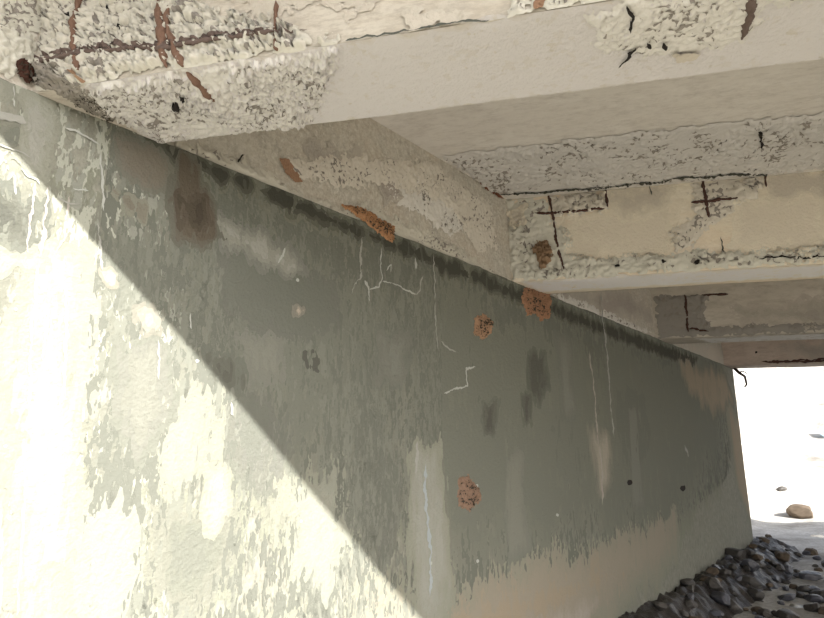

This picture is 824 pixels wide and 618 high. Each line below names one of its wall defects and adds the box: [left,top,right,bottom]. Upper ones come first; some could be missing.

spalling [0,0,824,281]
water stain [552,202,681,261]
spalling [553,293,824,339]